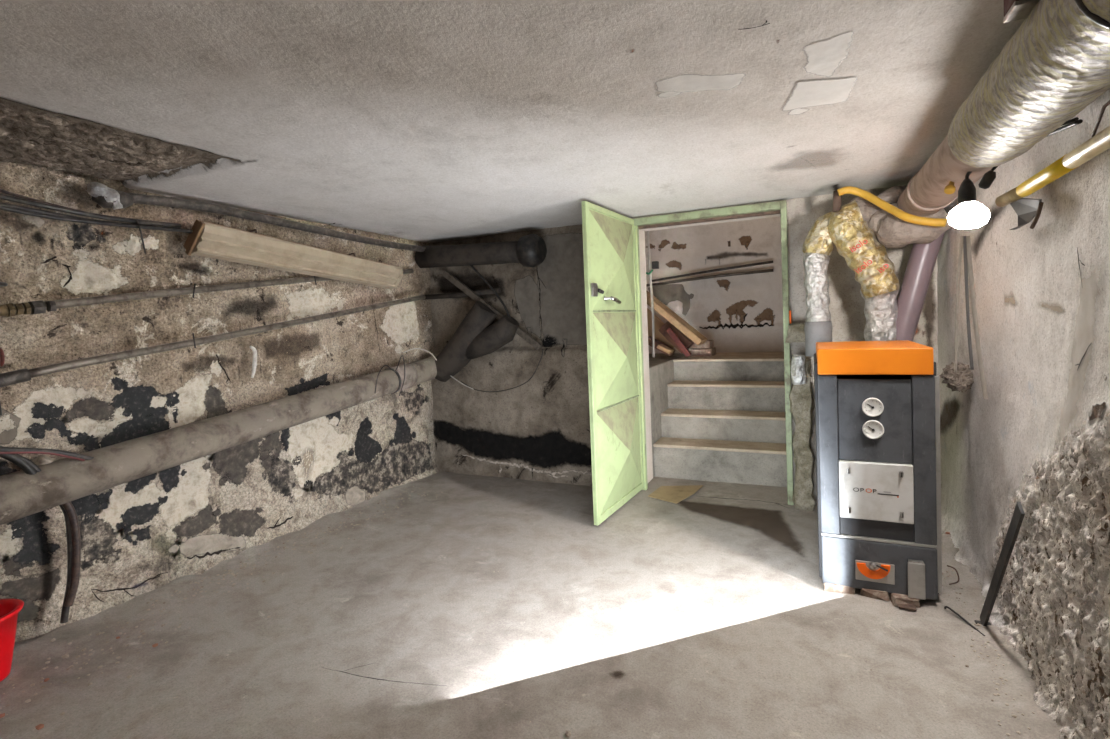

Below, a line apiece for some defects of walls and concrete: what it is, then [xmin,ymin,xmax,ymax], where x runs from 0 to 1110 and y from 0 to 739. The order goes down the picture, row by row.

spalling [0,97,240,184]
peeling [19,215,45,228]
peeling [59,232,159,296]
peeling [284,287,344,321]
peeling [380,296,420,354]
peeling [0,377,133,445]
peeling [150,361,232,429]
peeling [80,416,373,571]
peeling [0,528,62,624]
peeling [41,533,67,554]
spalling [993,402,1110,739]